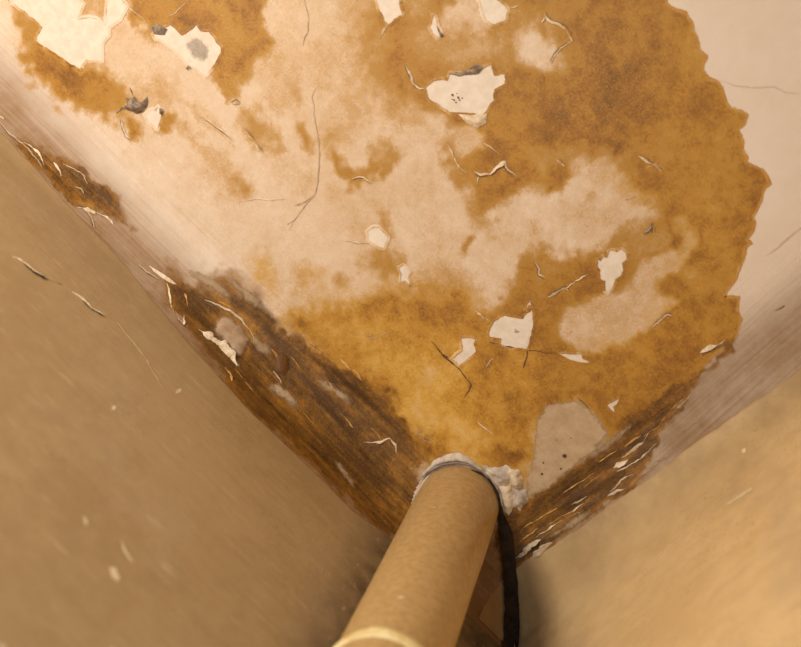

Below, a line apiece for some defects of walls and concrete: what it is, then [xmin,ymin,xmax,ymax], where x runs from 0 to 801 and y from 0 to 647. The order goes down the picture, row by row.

damp [12,6,143,141]
peeling [9,0,224,78]
damp [128,0,302,108]
peeling [374,0,405,36]
peeling [476,0,519,28]
damp [159,113,177,134]
peeling [404,62,517,184]
damp [17,142,133,229]
damp [165,0,772,581]
peeling [594,247,630,296]
crack [431,341,472,398]
peeling [449,300,536,368]